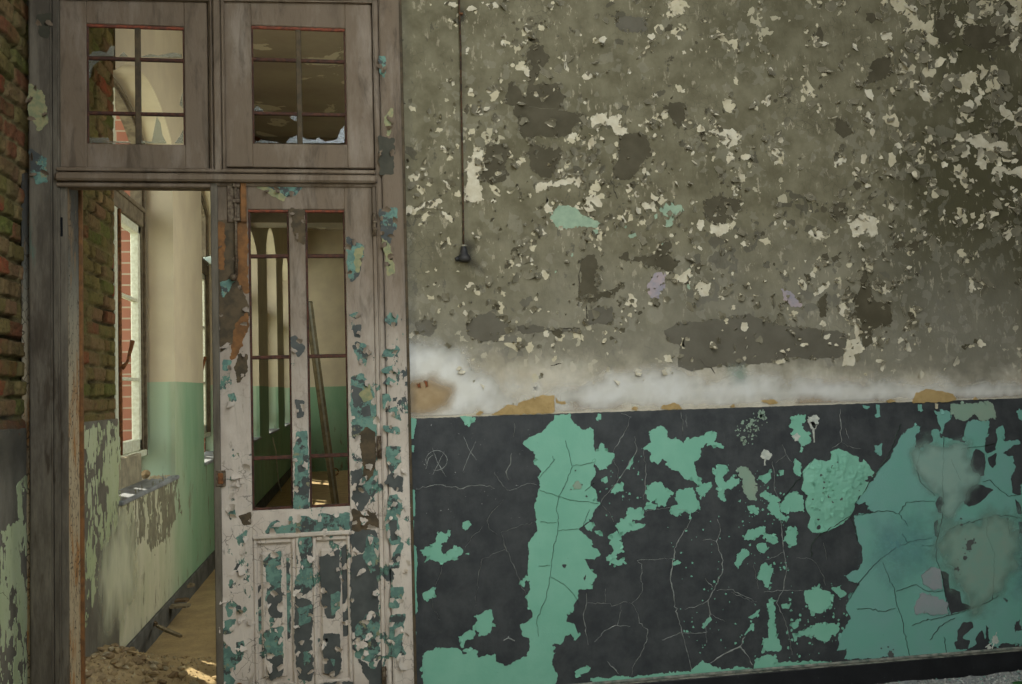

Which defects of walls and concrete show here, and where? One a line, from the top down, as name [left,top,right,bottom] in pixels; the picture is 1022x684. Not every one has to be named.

peeling [377,0,1022,381]
peeling [218,219,250,402]
water stain [409,345,513,416]
water stain [554,369,1022,410]
peeling [0,475,28,684]
peeling [84,420,182,627]
peeling [223,600,245,684]
peeling [228,509,252,543]
peeling [258,312,469,684]
crack [420,410,1020,673]
peeling [420,370,1022,684]
water stain [911,443,1021,615]